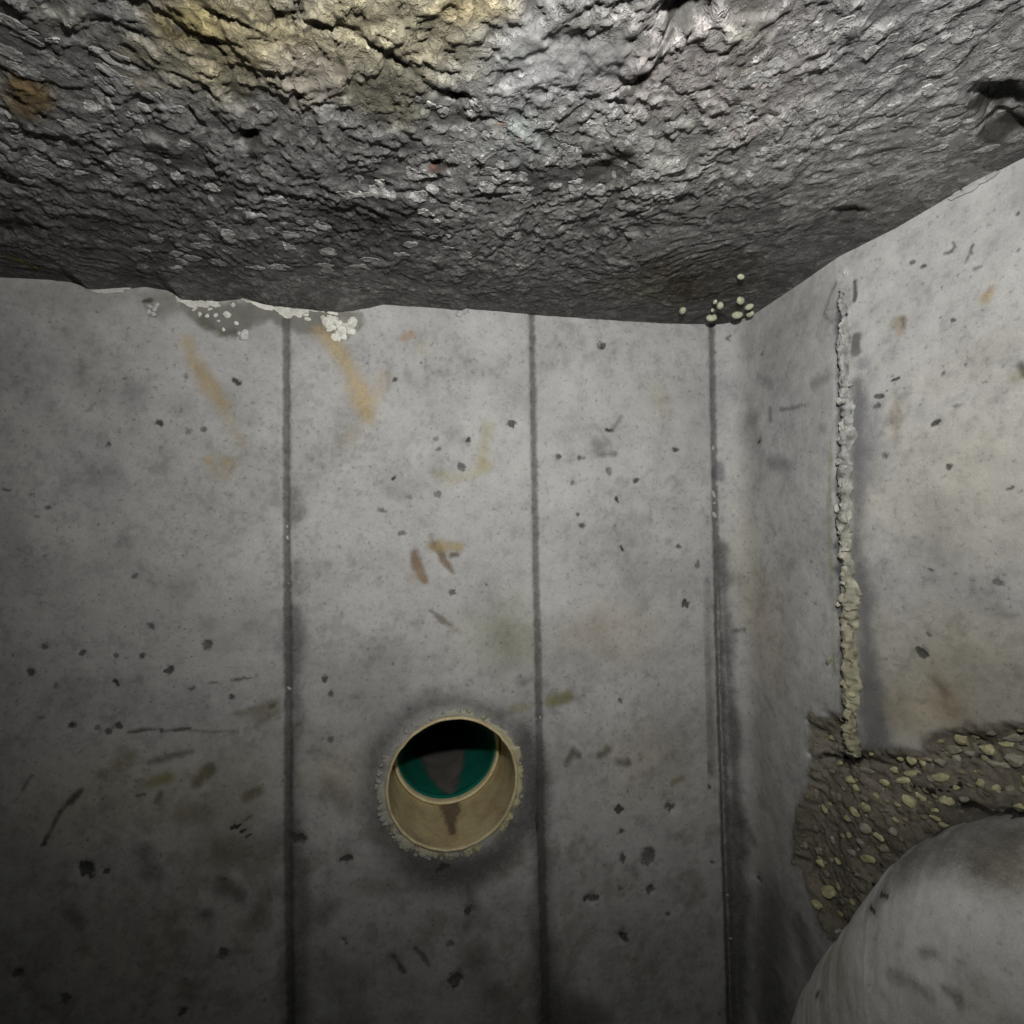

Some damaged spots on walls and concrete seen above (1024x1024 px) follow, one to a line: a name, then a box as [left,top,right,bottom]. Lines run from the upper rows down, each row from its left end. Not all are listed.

corrosion [412,551,427,583]
corrosion [429,543,462,569]
spalling [791,711,1024,941]